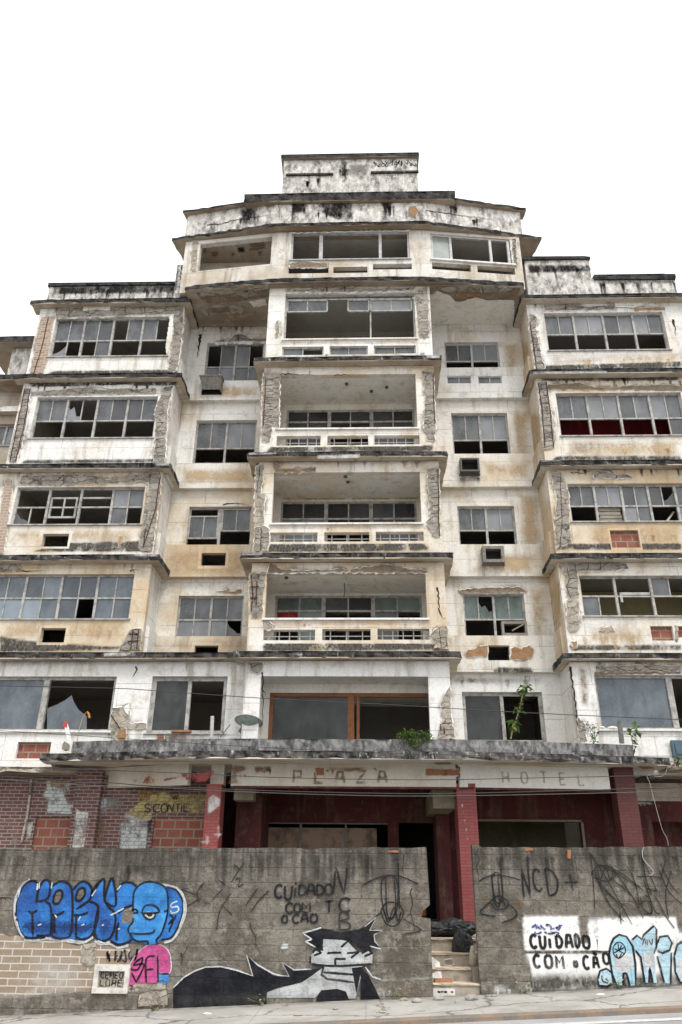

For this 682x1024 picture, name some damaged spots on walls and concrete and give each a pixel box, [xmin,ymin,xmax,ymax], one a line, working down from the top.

water stain [240,208,259,224]
water stain [292,203,306,216]
water stain [318,203,352,219]
spalling [538,382,554,448]
spalling [9,389,30,461]
flaking render [565,600,581,650]
flaking render [465,645,489,659]
flaking render [509,644,535,661]